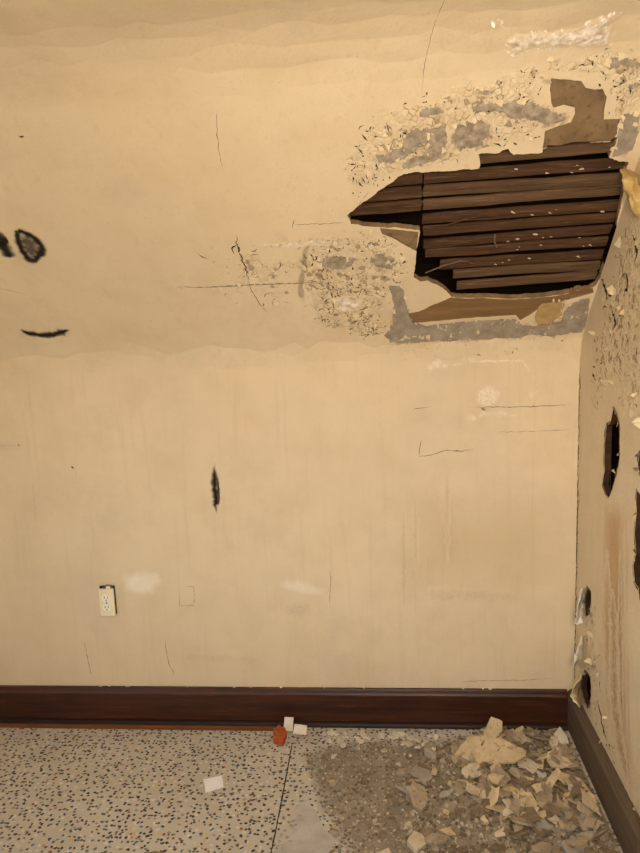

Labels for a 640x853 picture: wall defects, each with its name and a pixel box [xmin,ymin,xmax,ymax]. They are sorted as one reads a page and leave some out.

crack [181,238,339,326]
peeling [190,46,640,435]
peeling [570,584,635,811]